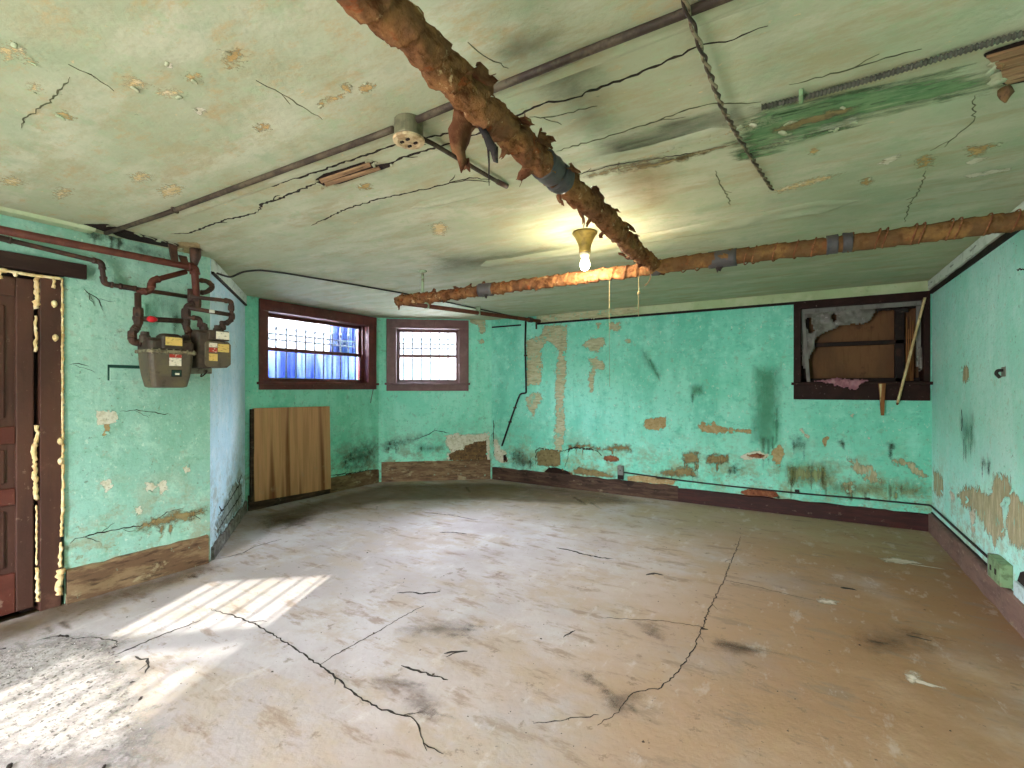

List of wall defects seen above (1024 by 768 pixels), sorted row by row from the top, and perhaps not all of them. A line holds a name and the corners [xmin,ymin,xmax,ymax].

crack [21,64,114,128]
crack [174,132,488,234]
flaking render [314,160,394,190]
crack [516,26,767,174]
water stain [588,75,988,178]
peeling [525,307,638,478]
peeling [642,416,666,431]
peeling [696,422,751,435]
water stain [758,373,774,453]
peeling [892,458,1024,550]
crack [37,606,443,754]
crack [533,538,815,725]